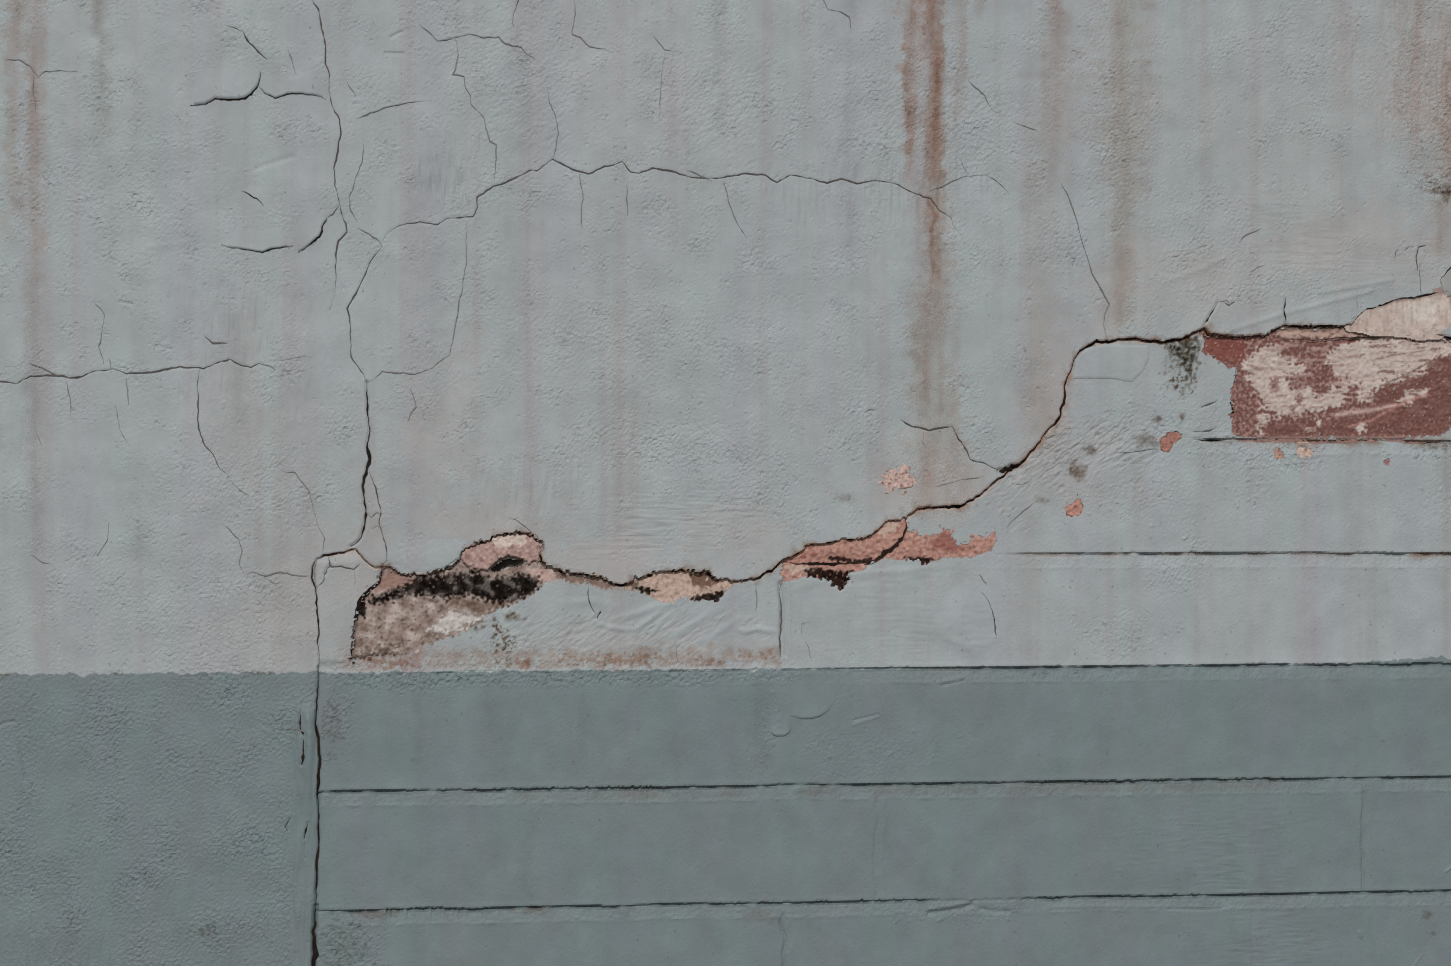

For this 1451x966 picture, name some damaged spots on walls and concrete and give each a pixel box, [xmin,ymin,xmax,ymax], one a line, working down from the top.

crack [5,59,71,109]
crack [0,306,313,494]
spalling [349,532,742,664]
crack [226,0,1358,966]
spalling [780,516,996,591]
spalling [1202,267,1451,466]